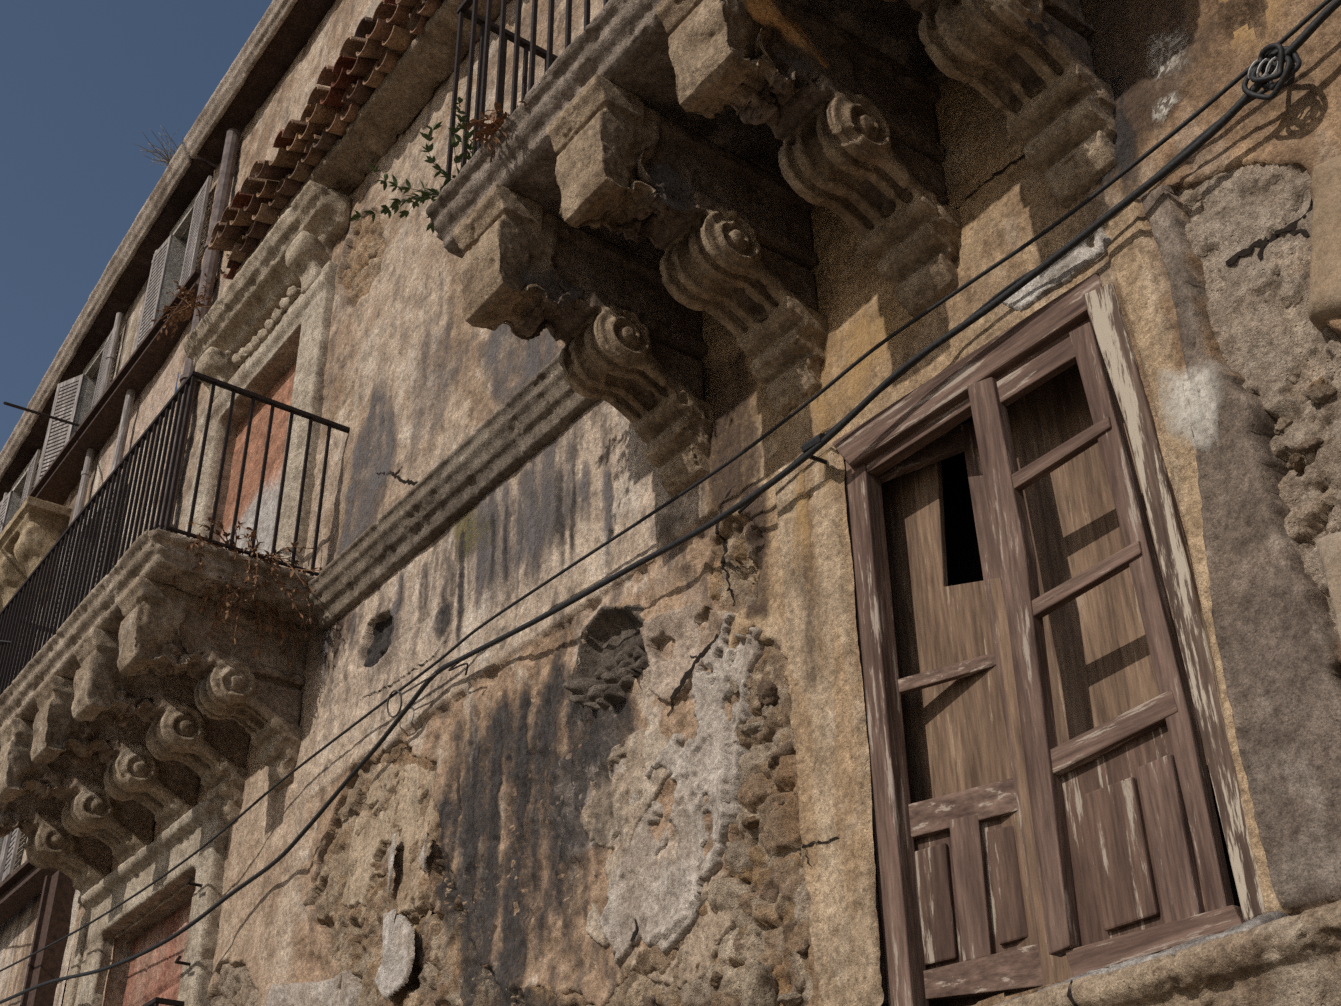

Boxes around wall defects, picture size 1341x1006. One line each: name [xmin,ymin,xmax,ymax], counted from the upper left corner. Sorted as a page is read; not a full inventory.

spalling [211,519,813,1006]
damp [435,440,613,638]
damp [436,648,634,1006]
crack [667,488,735,716]
crack [1067,979,1078,1006]
spalling [1176,163,1341,640]